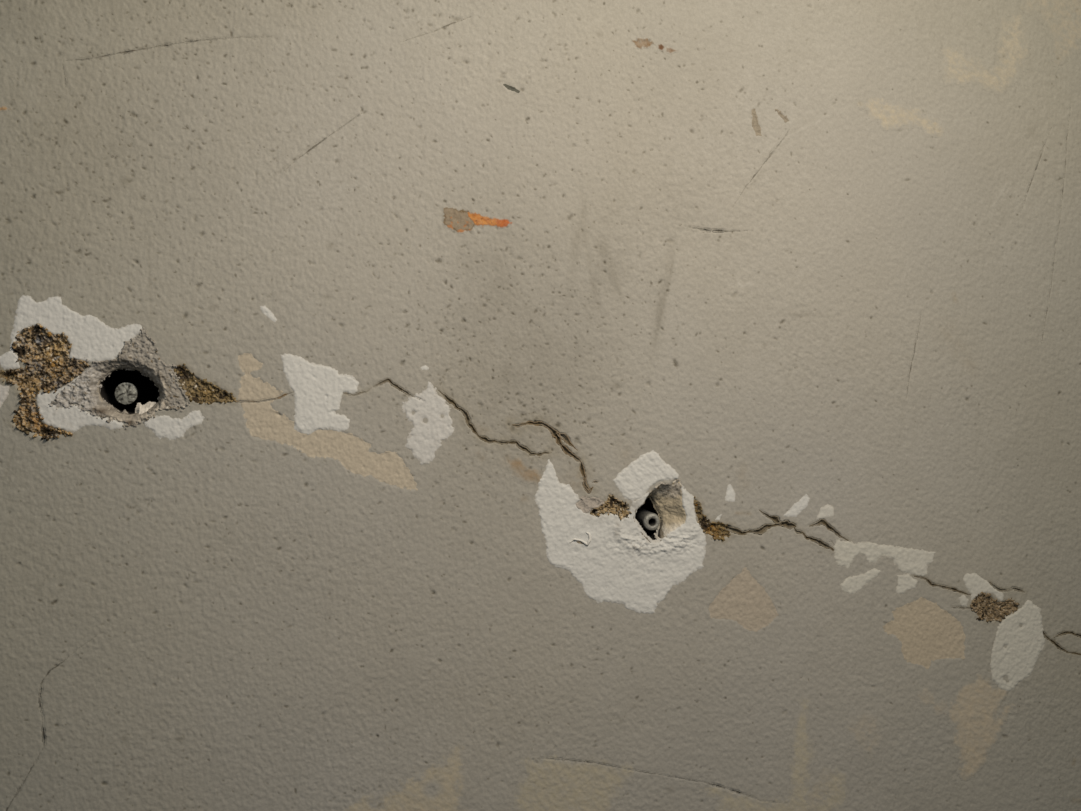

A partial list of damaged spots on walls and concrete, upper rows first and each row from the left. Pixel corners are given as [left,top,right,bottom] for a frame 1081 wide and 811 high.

rust [442,206,513,234]
peeling [0,295,455,491]
crack [233,391,294,403]
crack [343,378,599,493]
peeling [725,484,736,502]
peeling [534,450,731,614]
crack [726,510,849,551]
peeling [834,539,936,595]
crack [914,576,1025,609]
peeling [958,573,1045,691]
crack [1043,631,1081,655]